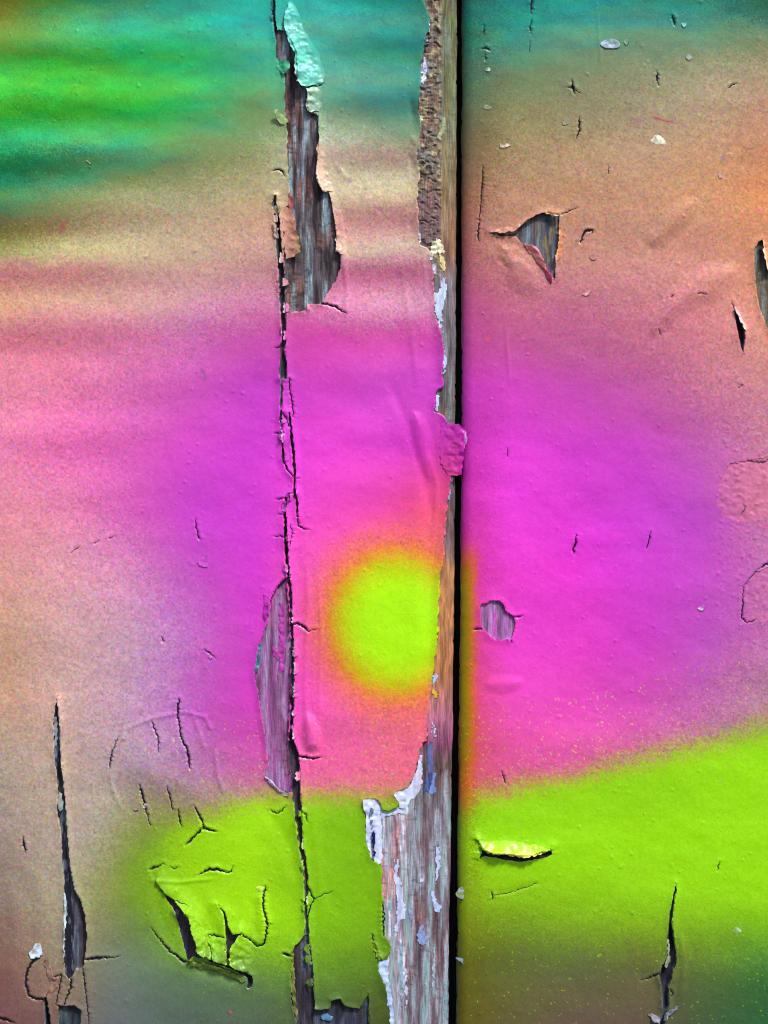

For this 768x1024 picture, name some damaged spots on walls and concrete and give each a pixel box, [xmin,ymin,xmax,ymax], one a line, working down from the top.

peeling [273,0,347,314]
peeling [491,207,576,284]
crack [731,303,747,351]
peeling [754,239,768,327]
peeling [363,0,467,1024]
crack [271,196,332,1024]
peeling [473,600,521,643]
crack [152,700,190,768]
crack [53,703,121,1024]
crack [139,788,217,844]
peeling [151,886,271,988]
crack [641,886,678,1024]